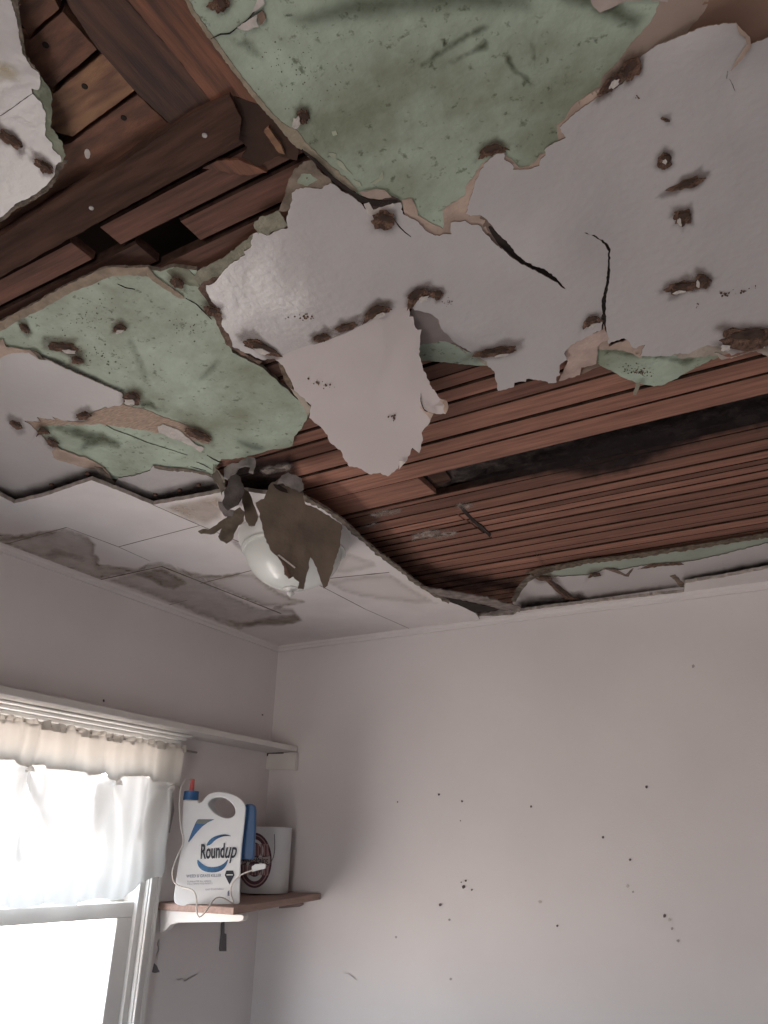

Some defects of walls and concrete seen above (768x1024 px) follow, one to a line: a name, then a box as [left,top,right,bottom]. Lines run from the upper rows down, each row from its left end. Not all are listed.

crack [301,149,411,237]
peeling [0,0,768,496]
crack [488,226,565,288]
crack [593,235,610,332]
damp [472,404,768,483]
peeling [511,532,768,608]